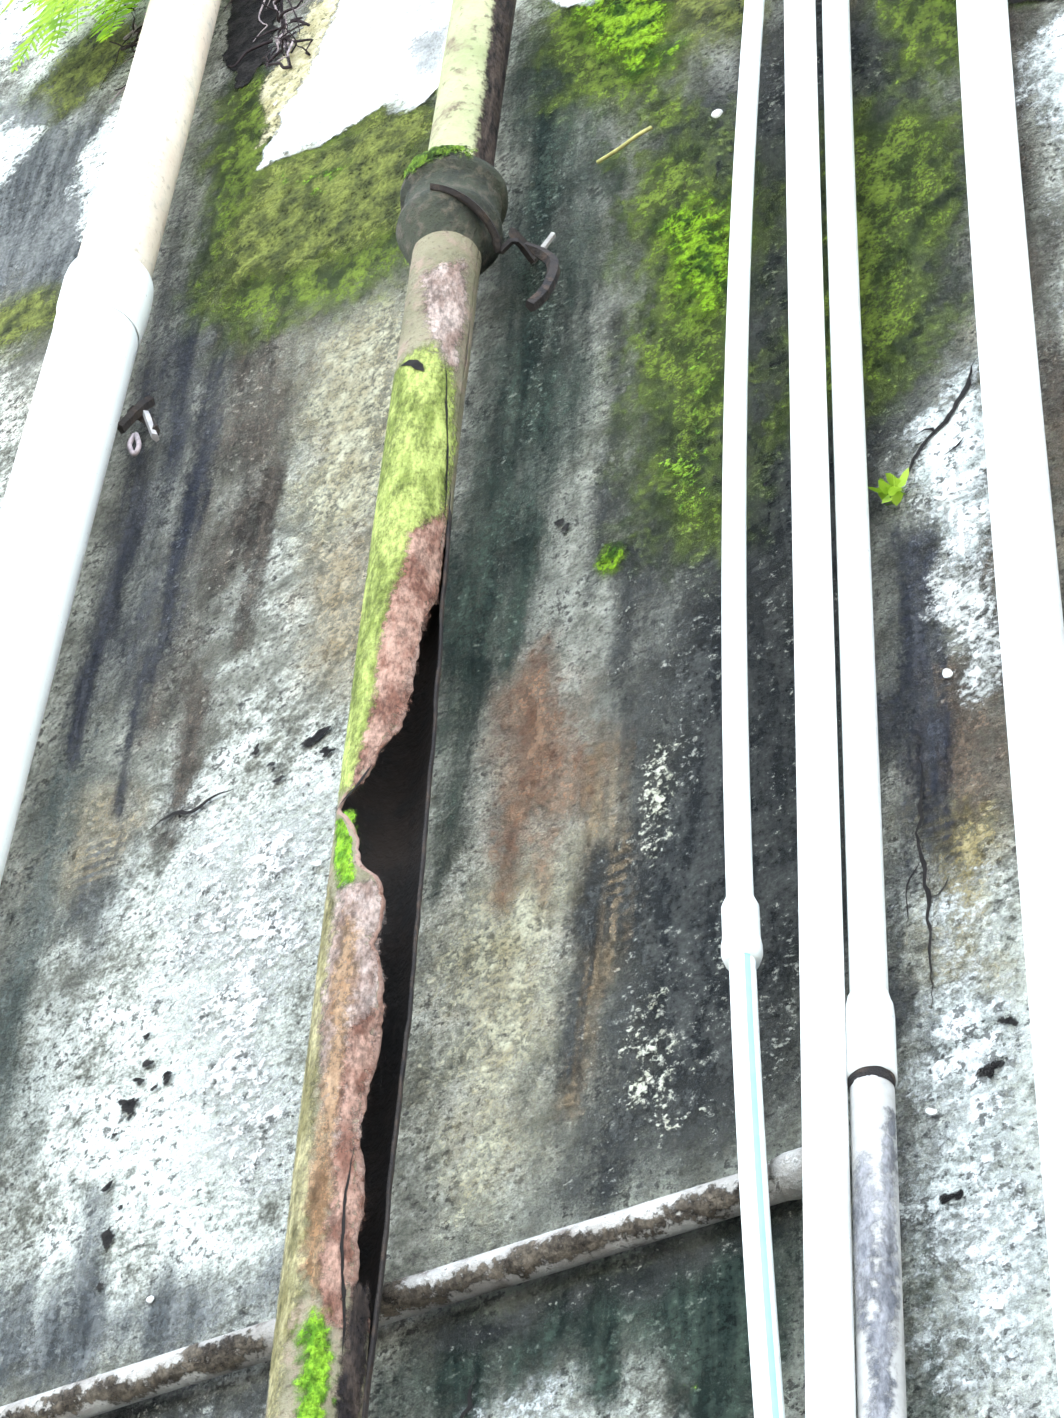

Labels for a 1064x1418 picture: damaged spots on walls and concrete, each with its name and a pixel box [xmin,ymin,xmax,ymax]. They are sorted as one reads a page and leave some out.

peeling [0,0,64,60]
peeling [222,0,453,171]
water stain [0,45,403,1148]
rust [492,636,622,946]
water stain [420,27,741,1218]
water stain [746,18,801,1128]
water stain [827,382,849,995]
water stain [849,0,974,1060]
crack [905,745,950,1008]
crack [909,358,977,472]
crack [460,1371,476,1418]
water stain [371,1215,754,1418]